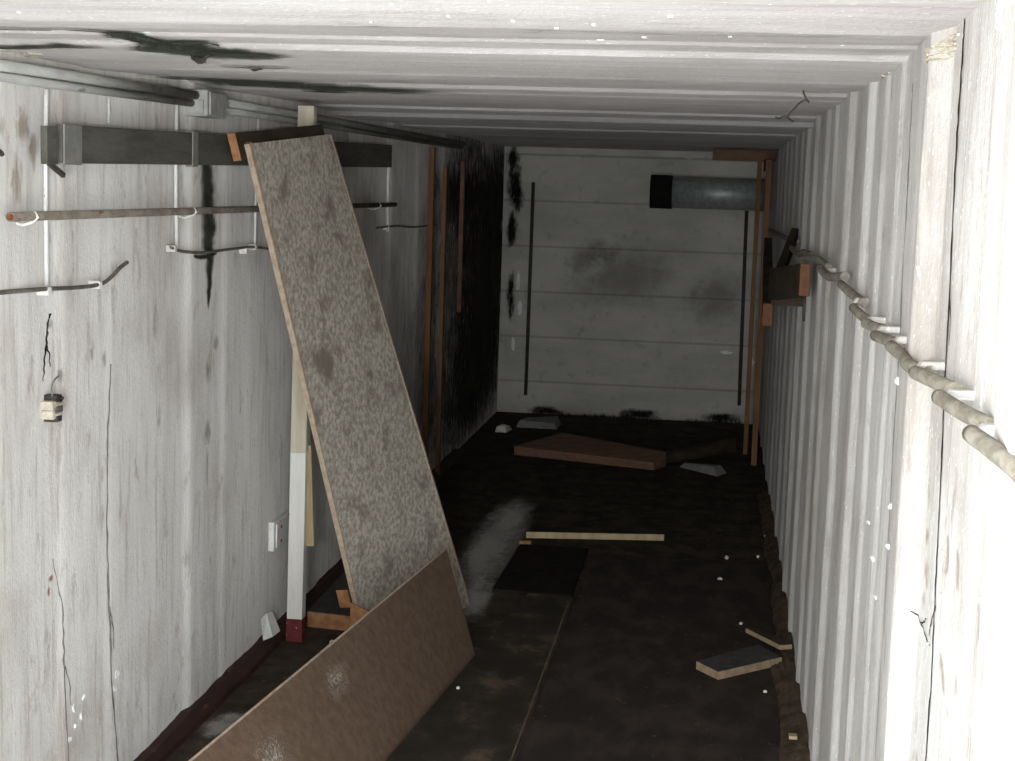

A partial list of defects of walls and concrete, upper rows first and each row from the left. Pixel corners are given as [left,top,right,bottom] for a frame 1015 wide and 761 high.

damp [194,165,217,307]
damp [415,135,521,456]
crack [944,18,965,377]
crack [910,410,944,761]